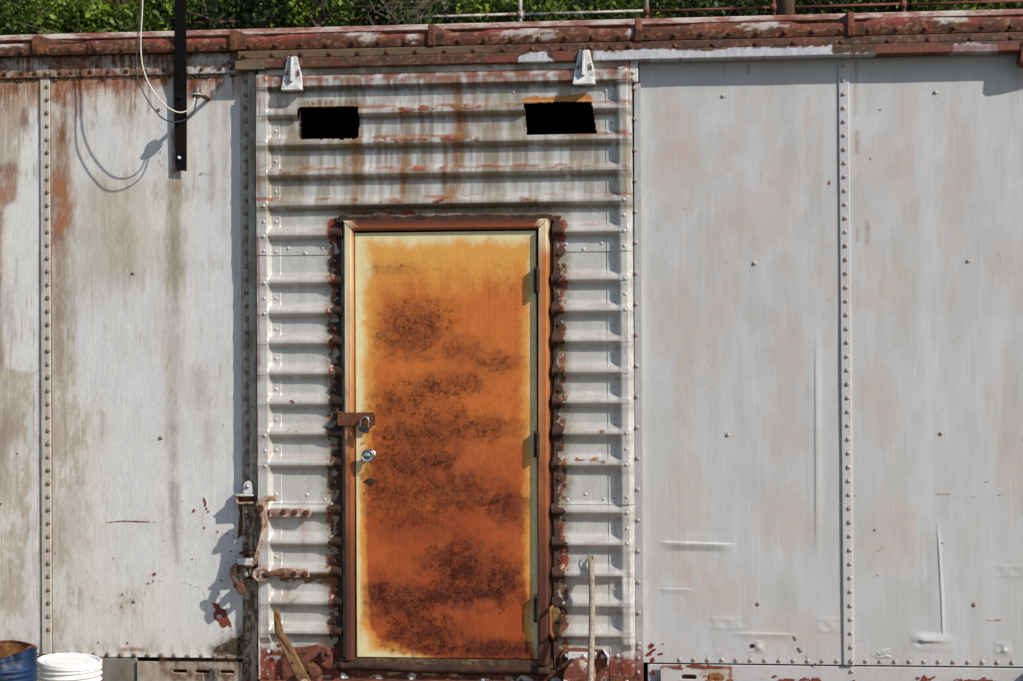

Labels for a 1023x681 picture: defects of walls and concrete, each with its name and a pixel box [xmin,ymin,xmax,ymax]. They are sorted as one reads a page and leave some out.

rust [433,84,480,204]
peeling [212,579,232,632]
rust [371,542,519,656]